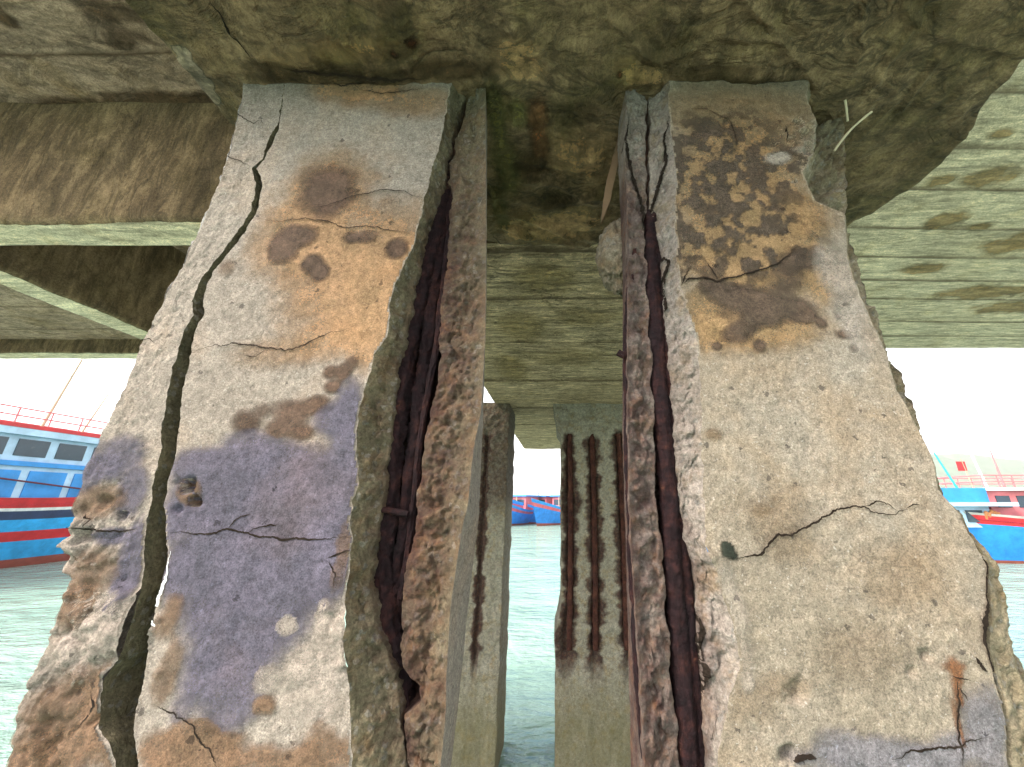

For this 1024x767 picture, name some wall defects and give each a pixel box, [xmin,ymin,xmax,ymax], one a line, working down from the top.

crack [67,4,417,767]
damp [155,157,416,731]
spalling [343,84,487,767]
rust [589,434,599,651]
spalling [617,81,740,767]
crack [621,106,737,232]
crack [660,245,798,312]
damp [672,100,867,351]
crack [734,500,922,559]
crack [892,548,995,765]
rust [946,659,965,742]